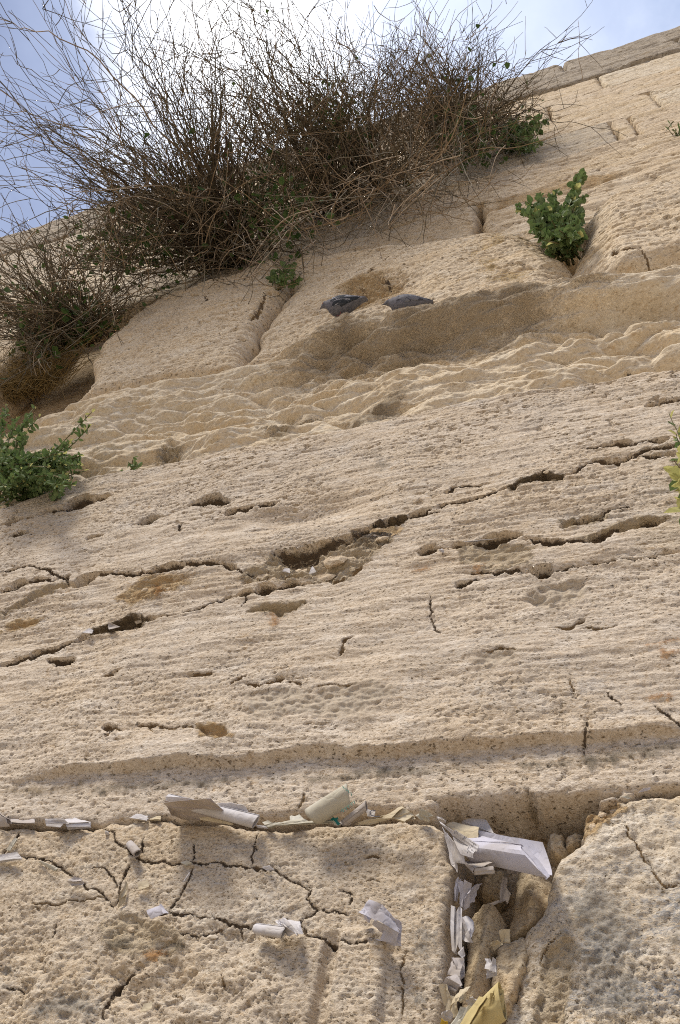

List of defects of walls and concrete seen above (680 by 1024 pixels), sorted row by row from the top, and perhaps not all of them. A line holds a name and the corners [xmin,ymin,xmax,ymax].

crack [571,440,679,475]
crack [178,499,275,531]
crack [407,485,498,520]
spalling [90,573,192,636]
crack [3,531,370,617]
spalling [246,599,306,618]
spalling [241,514,408,586]
crack [422,506,669,589]
crack [6,642,76,667]
crack [4,829,380,952]
crack [102,974,135,1020]
peeling [531,932,582,1024]